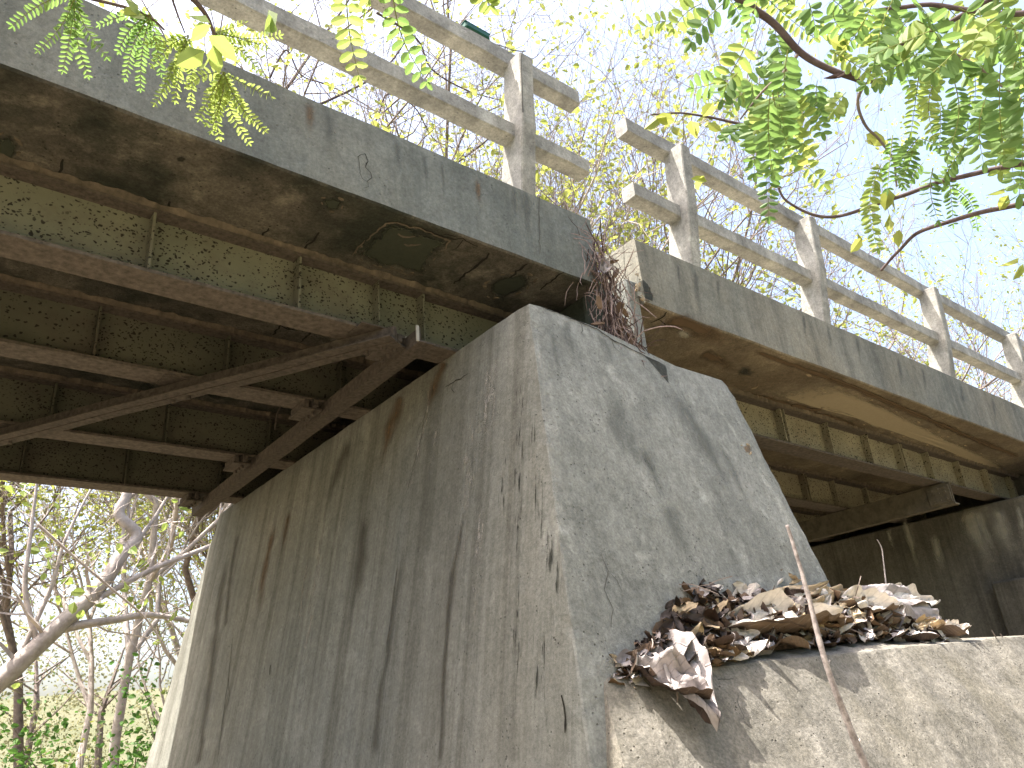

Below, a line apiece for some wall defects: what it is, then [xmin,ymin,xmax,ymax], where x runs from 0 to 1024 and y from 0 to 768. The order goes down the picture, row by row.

damp [439,531,461,757]